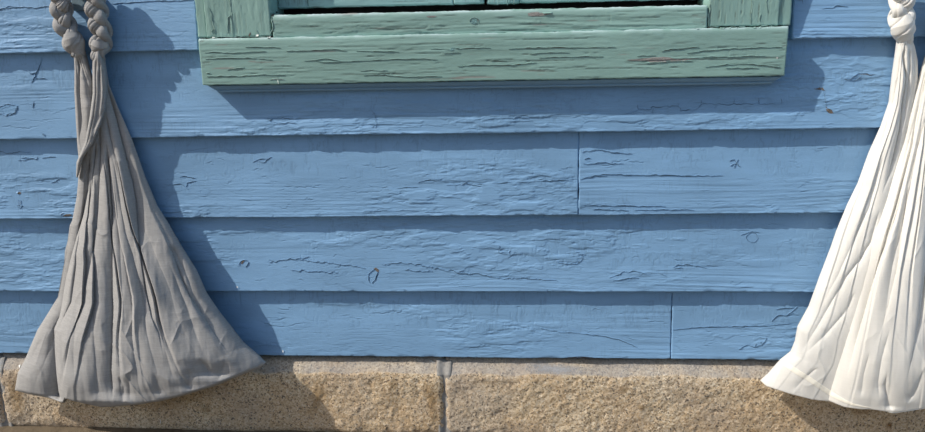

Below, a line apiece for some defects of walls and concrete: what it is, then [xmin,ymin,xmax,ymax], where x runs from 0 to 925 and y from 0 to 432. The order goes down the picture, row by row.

peeling [630,55,698,63]
crack [625,99,783,114]
crack [271,253,583,294]